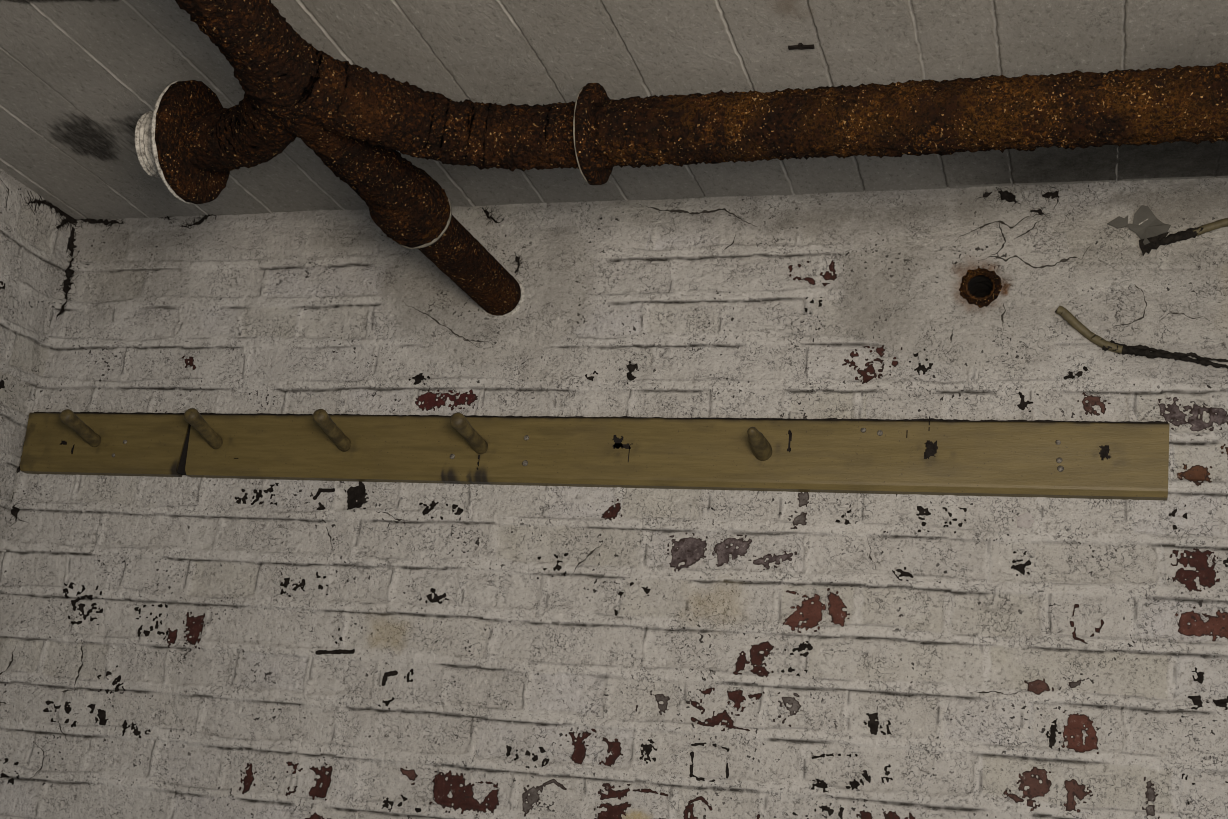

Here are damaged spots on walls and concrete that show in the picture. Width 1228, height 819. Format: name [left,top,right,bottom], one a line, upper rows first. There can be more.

crack [955,213,1090,269]
corrosion [959,267,1009,308]
peeling [667,532,797,571]
peeling [1170,548,1228,592]
peeling [134,604,205,649]
peeling [1175,607,1228,642]
peeling [686,588,850,782]
peeling [1046,711,1099,754]
peeling [382,767,499,816]
peeling [792,779,915,819]
peeling [846,764,893,790]
peeling [1003,766,1093,813]